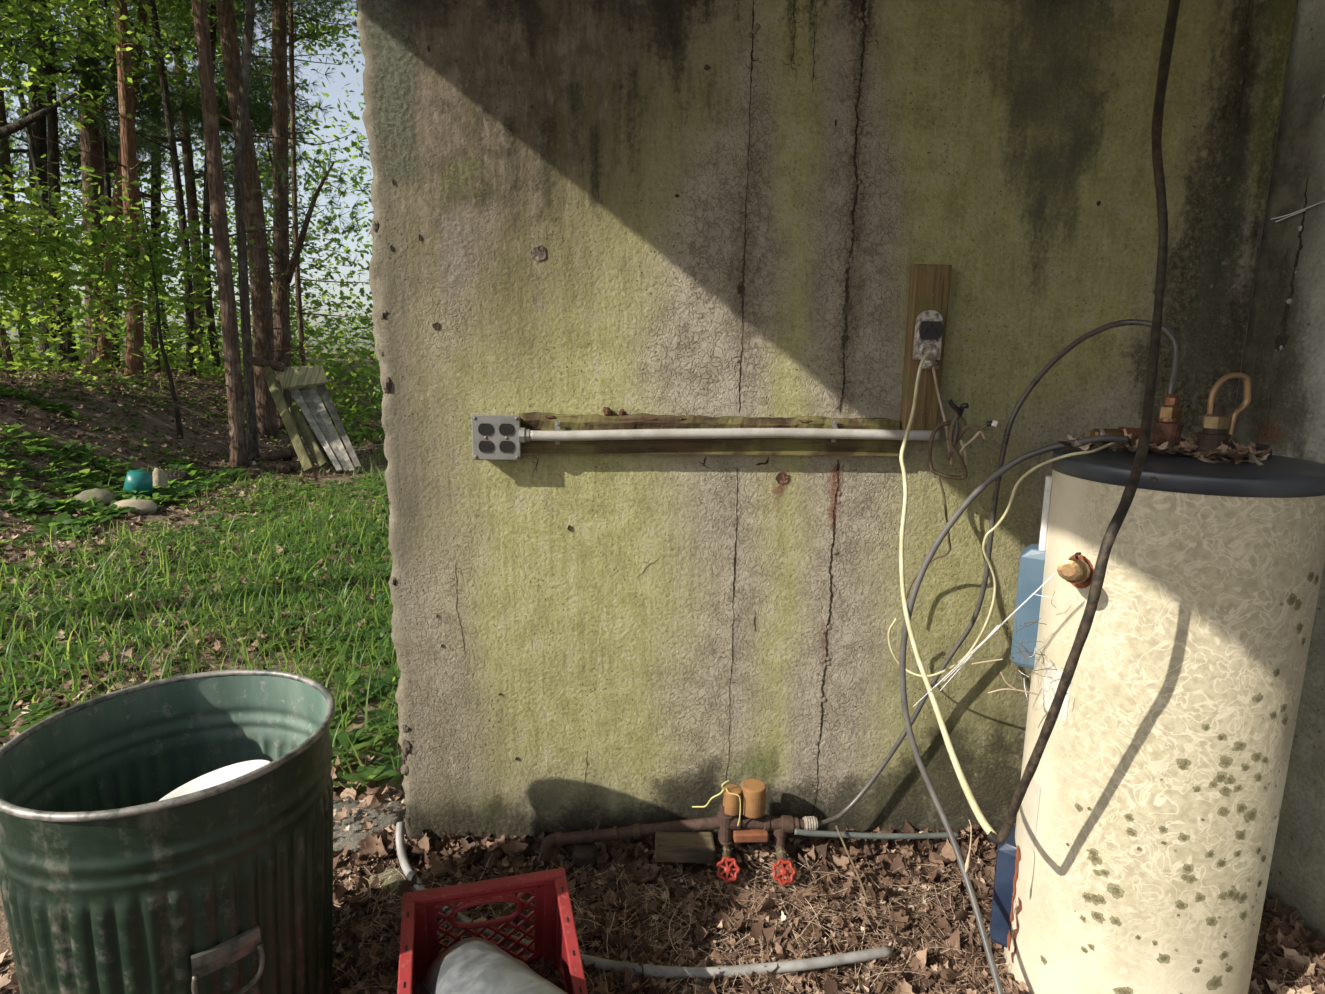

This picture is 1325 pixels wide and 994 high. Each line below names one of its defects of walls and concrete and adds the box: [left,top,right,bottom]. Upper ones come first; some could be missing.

damp [363,0,444,179]
crack [734,0,817,413]
crack [835,0,878,413]
damp [1229,124,1306,456]
damp [402,731,1022,848]
crack [809,460,841,805]